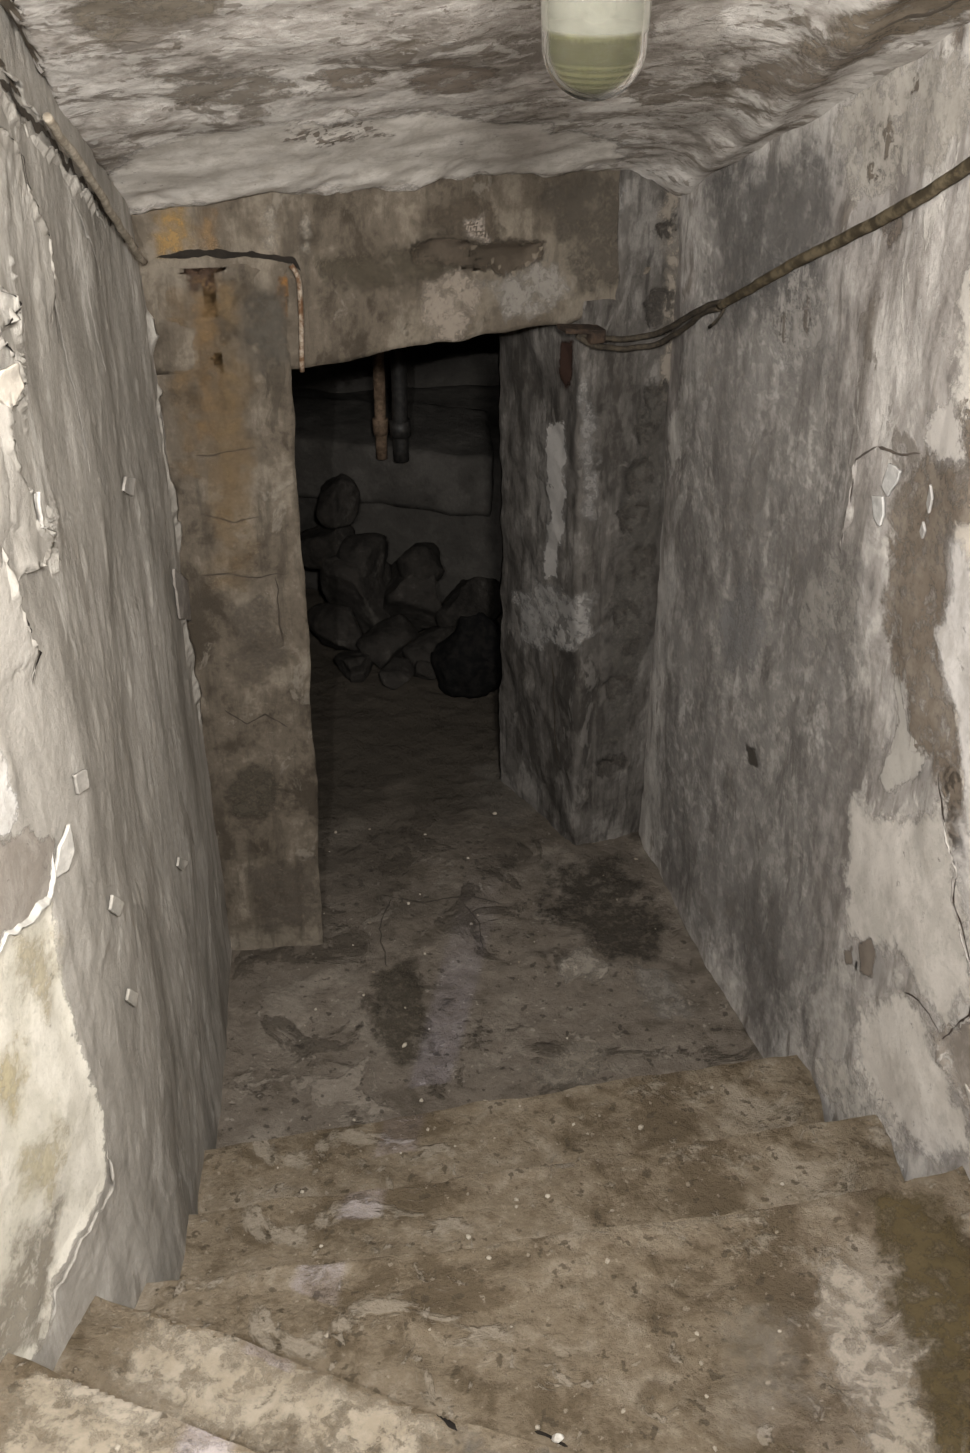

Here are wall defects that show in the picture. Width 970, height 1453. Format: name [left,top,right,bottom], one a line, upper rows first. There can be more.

spalling [0,0,46,76]
water stain [66,0,217,47]
peeling [832,46,970,203]
water stain [108,54,627,342]
peeling [772,263,828,379]
peeling [924,265,970,467]
peeling [871,463,902,526]
peeling [919,484,934,539]
flaking render [879,662,930,794]
flaking render [841,704,970,1164]
spalling [0,749,115,1364]
spalling [65,1379,162,1426]